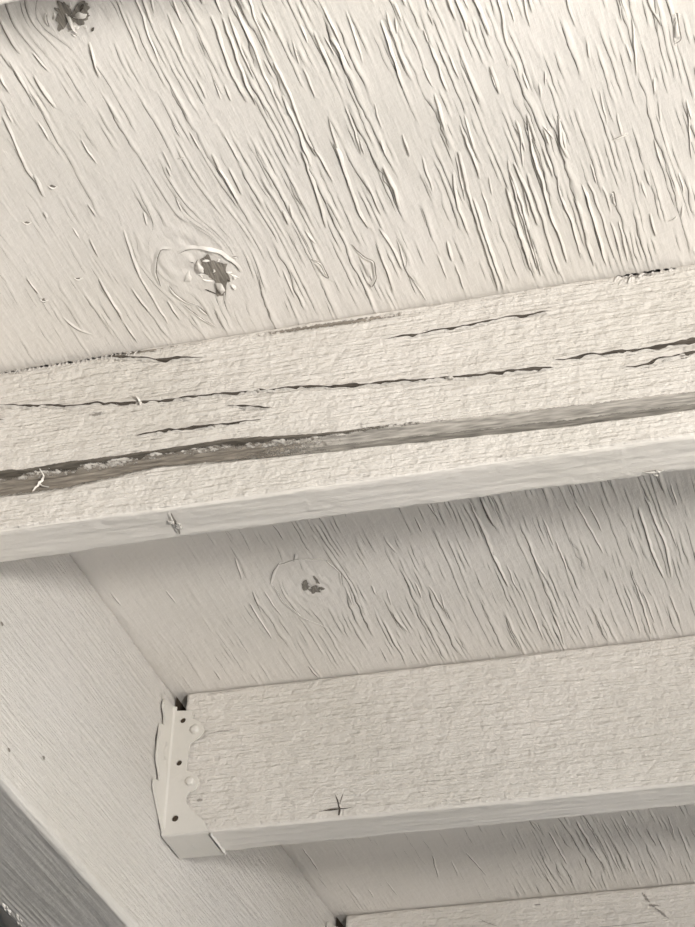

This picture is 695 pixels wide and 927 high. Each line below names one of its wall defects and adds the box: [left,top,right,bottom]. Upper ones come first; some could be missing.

peeling [65,2,94,34]
hole [302,576,325,594]
crack [167,470,695,680]
crack [396,805,694,894]